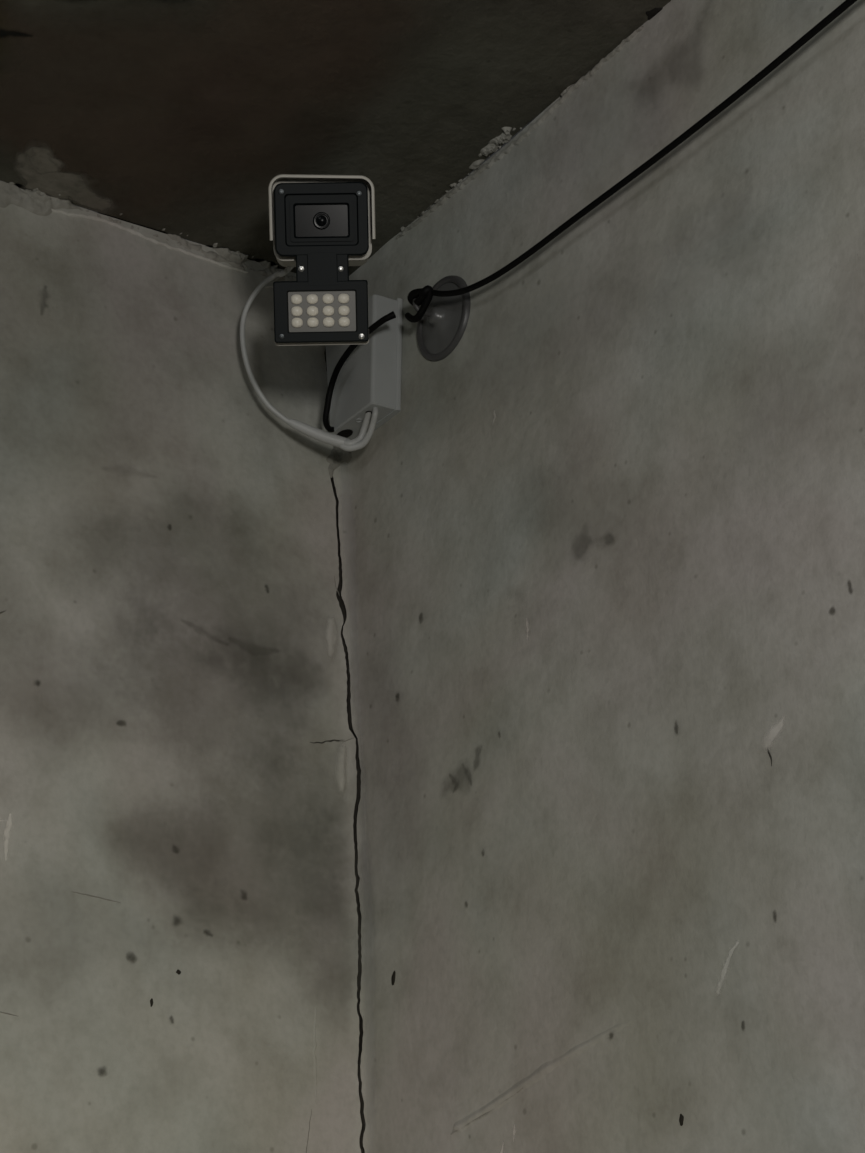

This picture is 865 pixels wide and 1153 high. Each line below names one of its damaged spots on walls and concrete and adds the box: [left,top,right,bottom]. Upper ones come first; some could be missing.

peeling [0,180,296,288]
crack [310,477,366,1153]